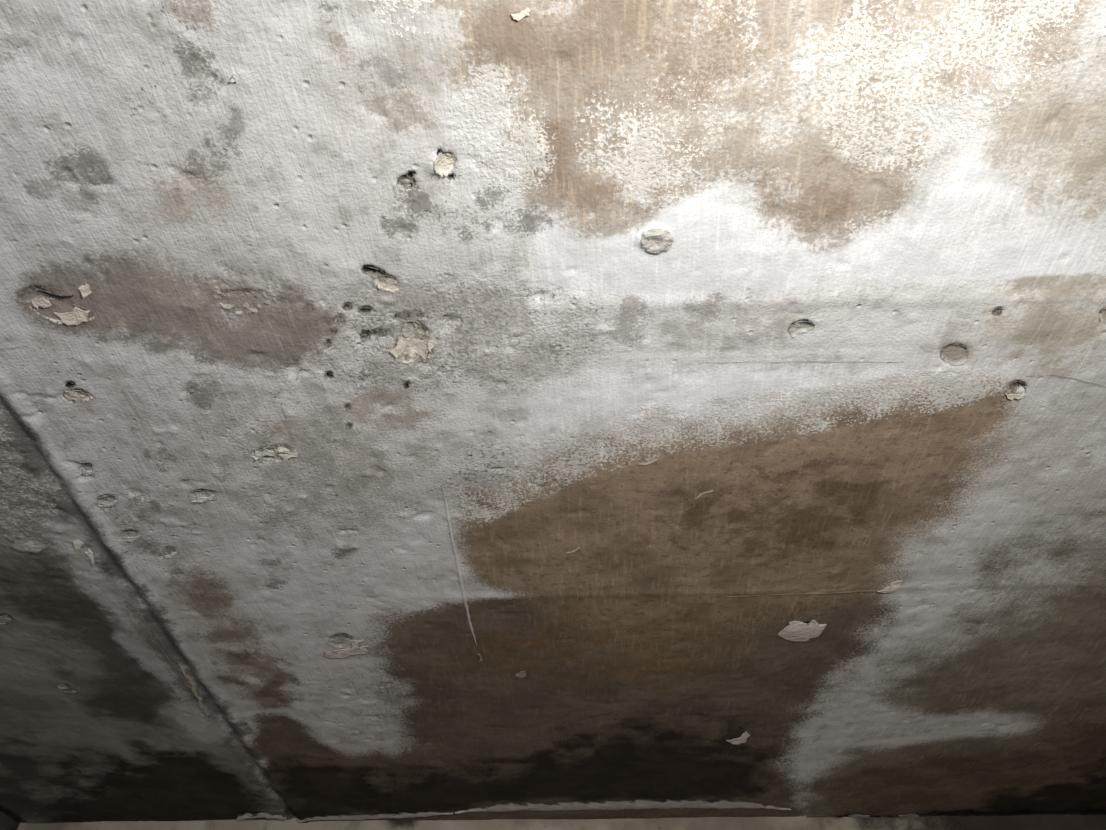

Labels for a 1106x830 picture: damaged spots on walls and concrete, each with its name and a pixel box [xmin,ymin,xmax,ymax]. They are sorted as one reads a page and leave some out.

damp [318,0,1088,243]
damp [22,145,112,214]
flaking render [16,284,96,325]
damp [17,254,346,373]
flaking render [304,302,371,348]
flaking render [360,311,437,364]
damp [2,562,163,723]
damp [164,369,1106,830]
peeling [778,620,827,642]
damp [0,740,265,830]